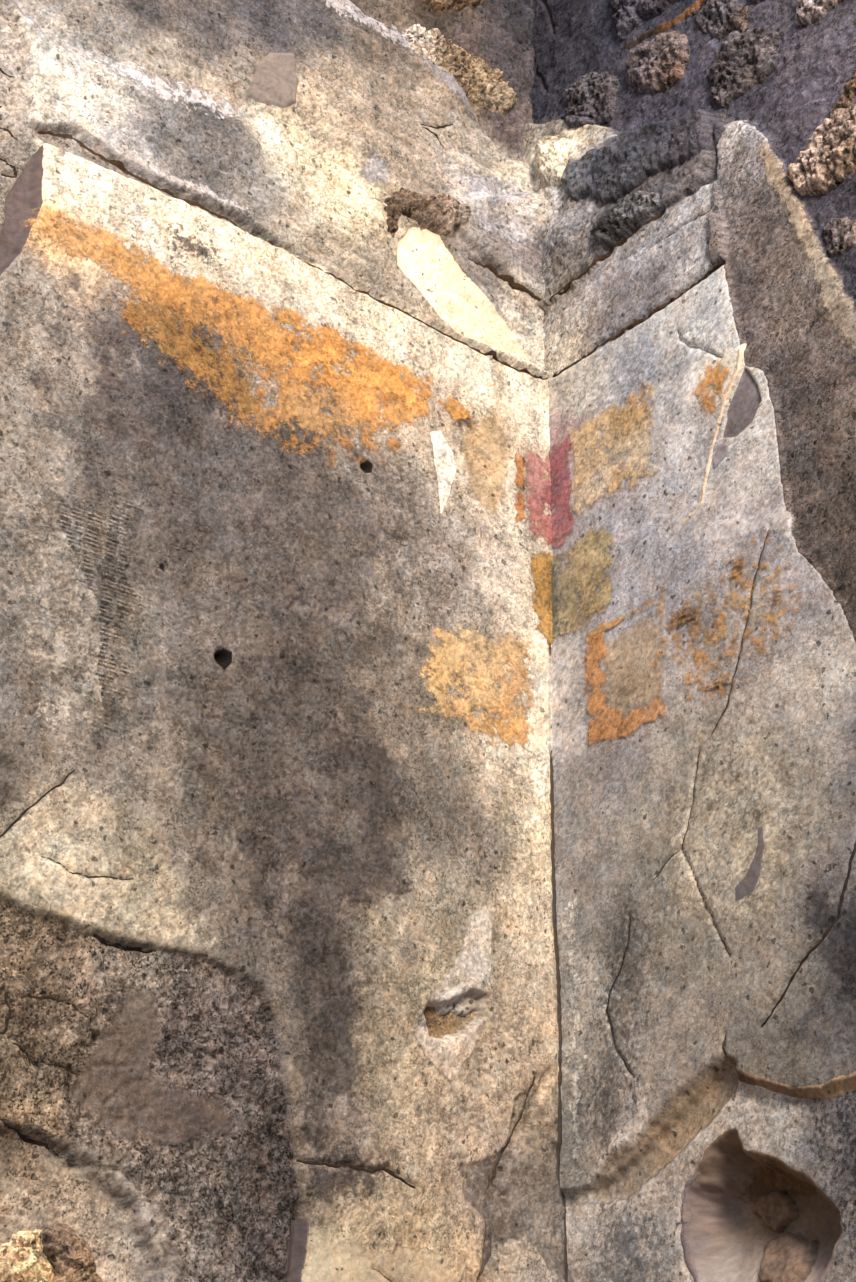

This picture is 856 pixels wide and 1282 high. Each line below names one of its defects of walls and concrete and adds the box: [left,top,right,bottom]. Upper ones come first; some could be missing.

spalling [384,0,856,642]
water stain [1,296,425,1203]
crack [653,525,771,956]
flaking render [414,904,492,1081]
crack [761,841,856,1027]
water stain [788,886,856,1052]
spalling [460,1076,569,1282]
spalling [595,1056,856,1282]
water stain [804,1071,856,1282]